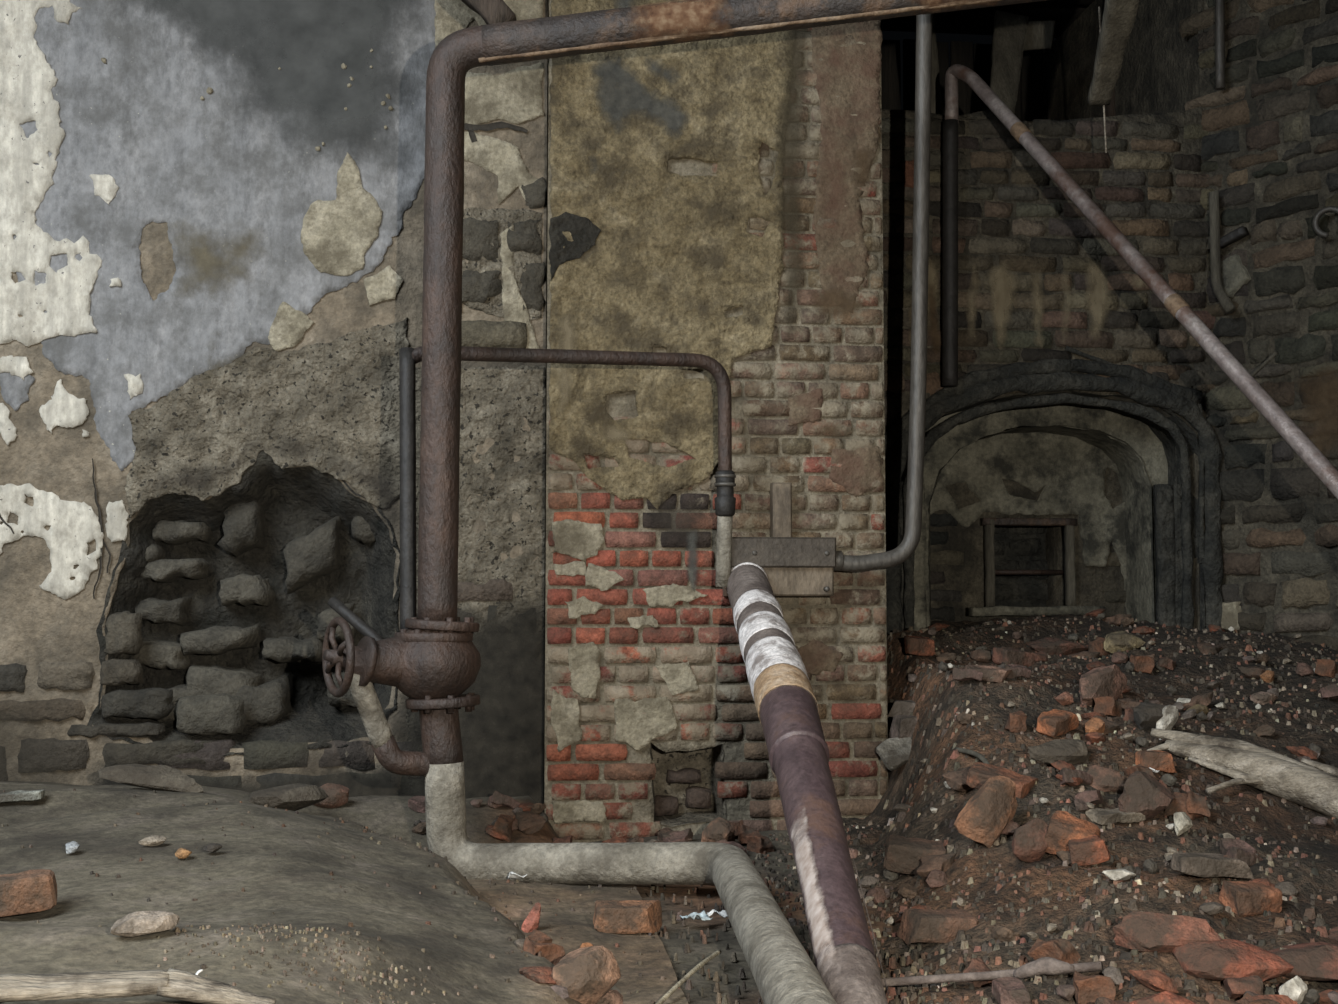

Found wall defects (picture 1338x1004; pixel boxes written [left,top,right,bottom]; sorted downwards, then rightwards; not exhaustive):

flaking render [503,0,684,21]
flaking render [810,20,883,313]
peeling [0,0,487,756]
flaking render [457,30,793,633]
flaking render [788,388,823,426]
flaking render [829,445,885,497]
flaking render [550,642,601,752]
spalling [614,661,727,827]
flaking render [797,638,844,675]
flaking render [552,800,607,824]